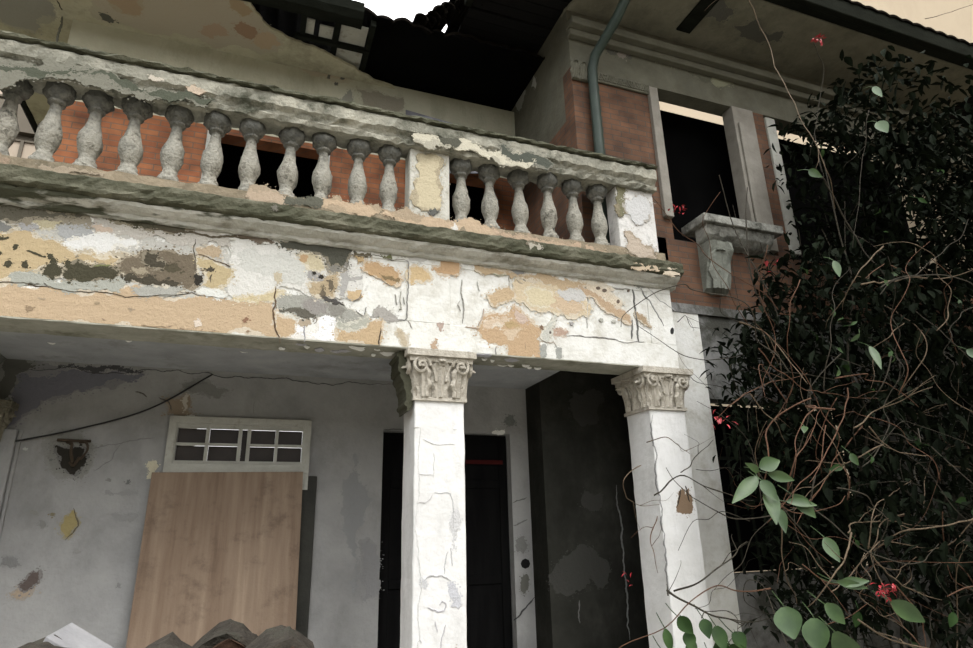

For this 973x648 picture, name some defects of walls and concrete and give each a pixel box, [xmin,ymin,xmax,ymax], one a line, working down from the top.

peeling [92,0,283,53]
peeling [0,219,409,357]
peeling [351,255,651,370]
crack [614,287,675,341]
crack [17,366,386,409]
spalling [676,487,696,518]
crack [384,427,457,648]